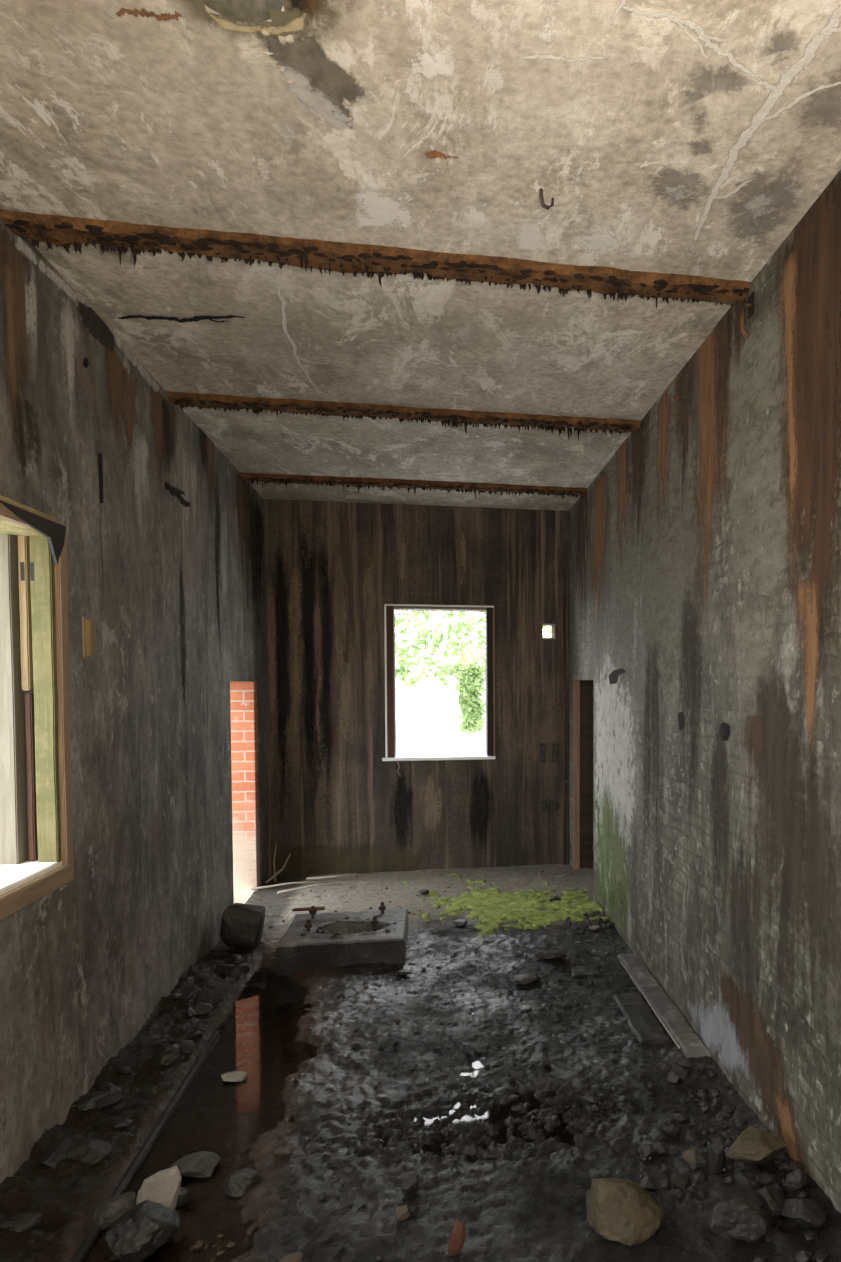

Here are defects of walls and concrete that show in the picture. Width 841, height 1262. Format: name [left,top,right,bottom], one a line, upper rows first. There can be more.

spalling [257,31,374,129]
leakage [686,65,745,124]
crack [610,0,841,250]
leakage [730,174,797,242]
crack [118,315,244,323]
rust [781,170,841,747]
leakage [248,494,378,801]
leakage [391,775,443,844]
leakage [469,773,492,843]
leakage [644,652,661,819]
leakage [680,603,702,790]
leakage [710,677,841,1012]